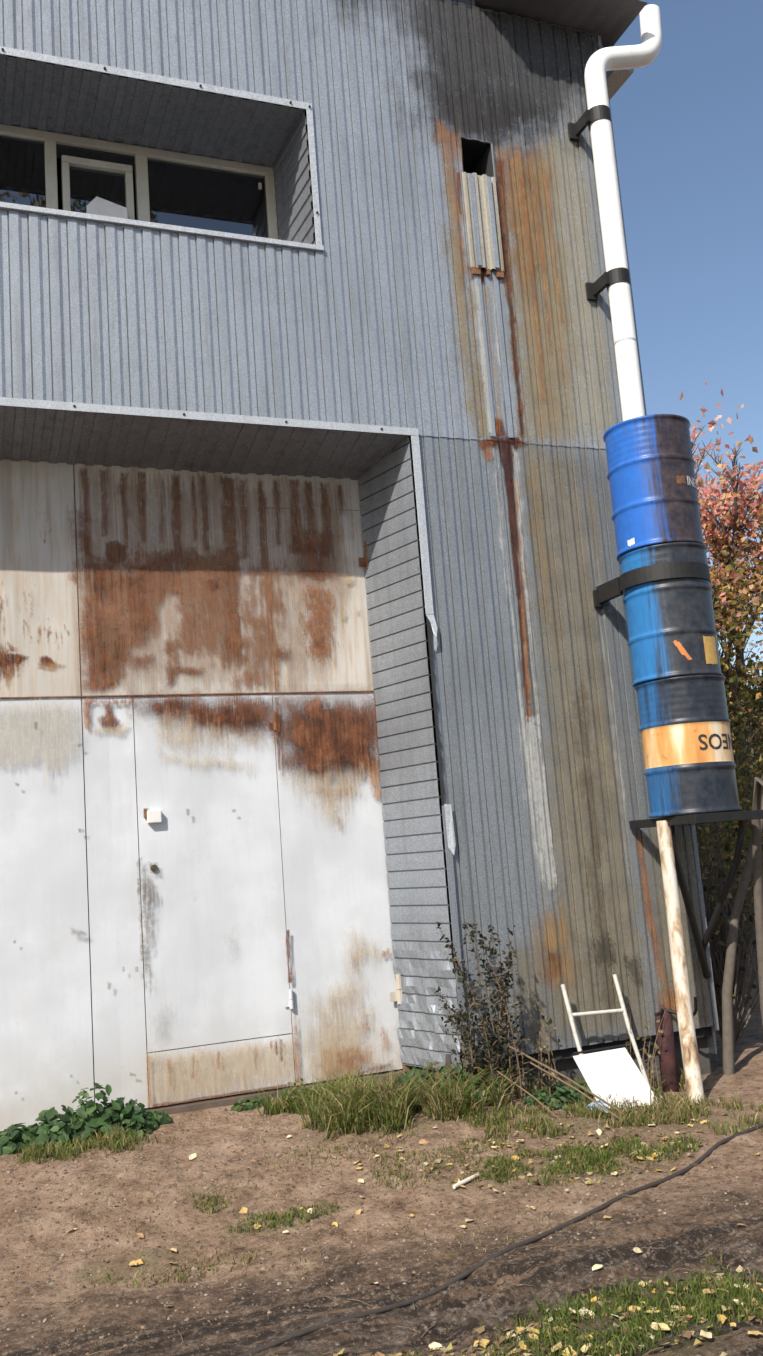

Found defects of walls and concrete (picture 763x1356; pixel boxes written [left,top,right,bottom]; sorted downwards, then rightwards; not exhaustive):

water stain [389,0,599,140]
corrosion [437,124,560,721]
corrosion [0,594,65,679]
corrosion [79,470,380,824]